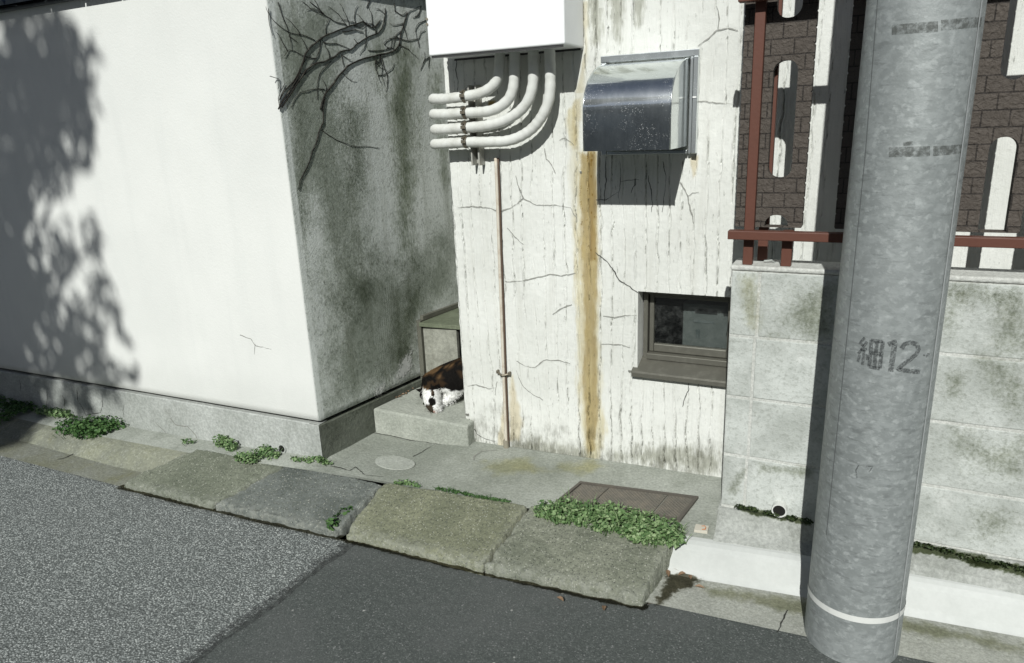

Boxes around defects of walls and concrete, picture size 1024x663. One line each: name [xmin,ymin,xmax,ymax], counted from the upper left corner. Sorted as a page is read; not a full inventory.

crack [458,178,577,244]
crack [596,160,697,224]
crack [505,273,575,282]
crack [596,253,638,318]
leakage [374,328,414,396]
crack [470,359,570,400]